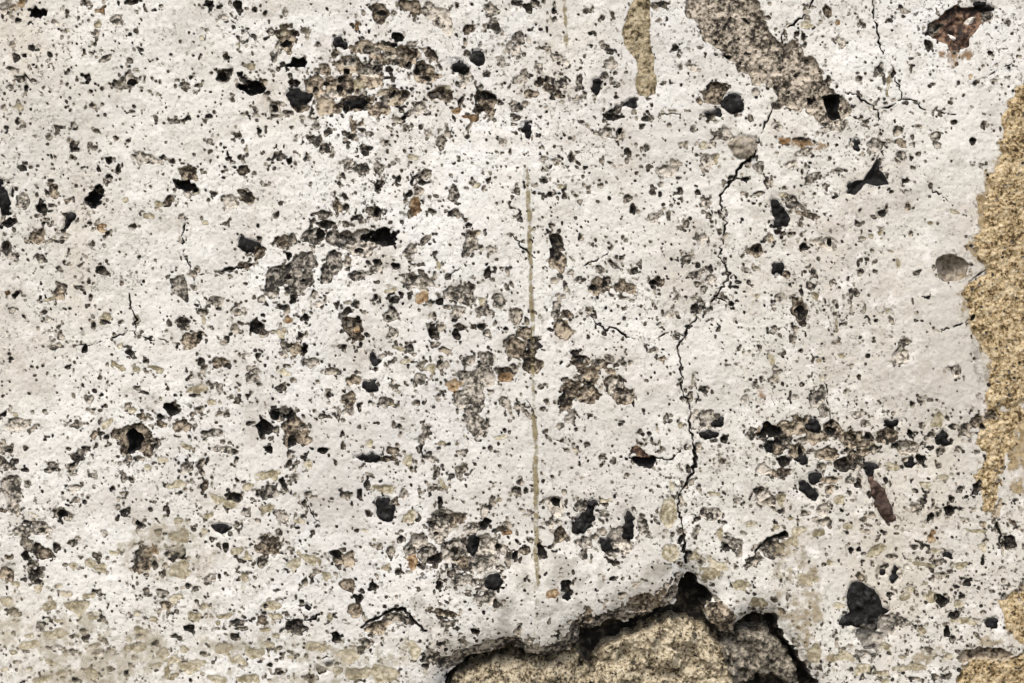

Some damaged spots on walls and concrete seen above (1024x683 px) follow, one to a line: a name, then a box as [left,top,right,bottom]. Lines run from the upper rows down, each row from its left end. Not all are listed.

spalling [658,37,704,87]
crack [845,0,956,158]
corrosion [939,37,972,67]
spalling [955,46,1024,146]
spalling [970,151,1024,220]
spalling [969,256,1024,323]
crack [588,90,779,564]
crack [753,532,784,558]
crack [360,607,428,632]
spalling [0,631,40,672]
spalling [38,663,82,683]
spalling [746,673,785,683]